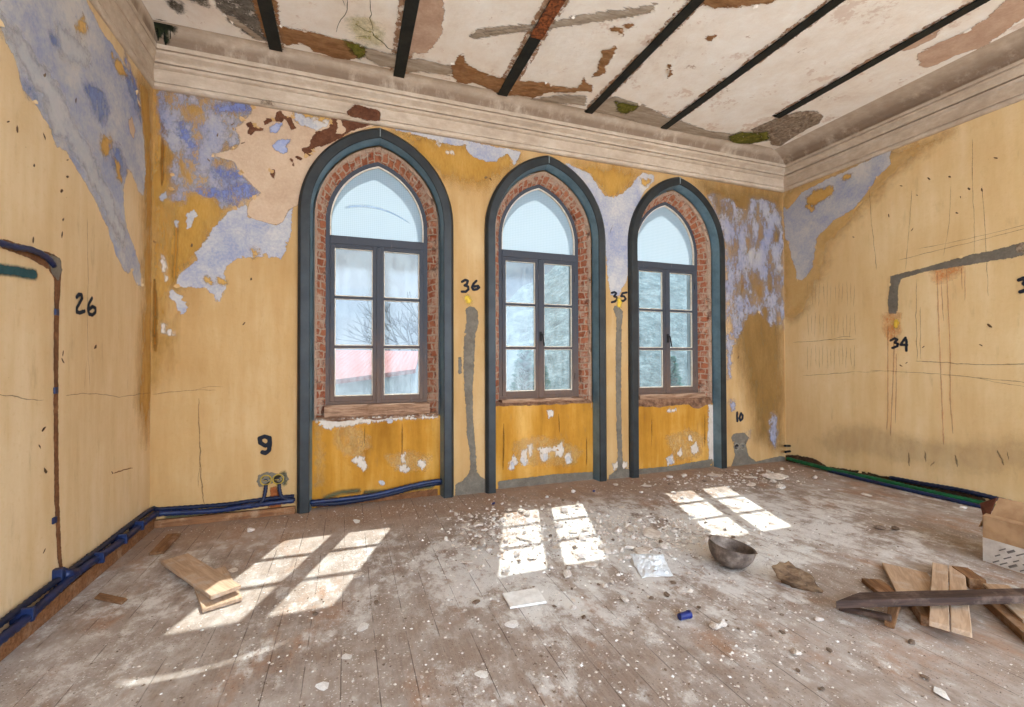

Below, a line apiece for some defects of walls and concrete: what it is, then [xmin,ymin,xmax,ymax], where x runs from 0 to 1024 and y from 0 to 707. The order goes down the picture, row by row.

peeling [0,0,146,287]
leakage [139,83,237,427]
flaking render [156,91,383,314]
crack [336,0,397,51]
peeling [396,129,522,165]
peeling [566,163,654,296]
peeling [276,0,1024,146]
peeling [709,151,891,379]
crack [66,359,217,502]
peeling [315,411,438,473]
peeling [508,441,572,470]
spalling [639,397,713,466]